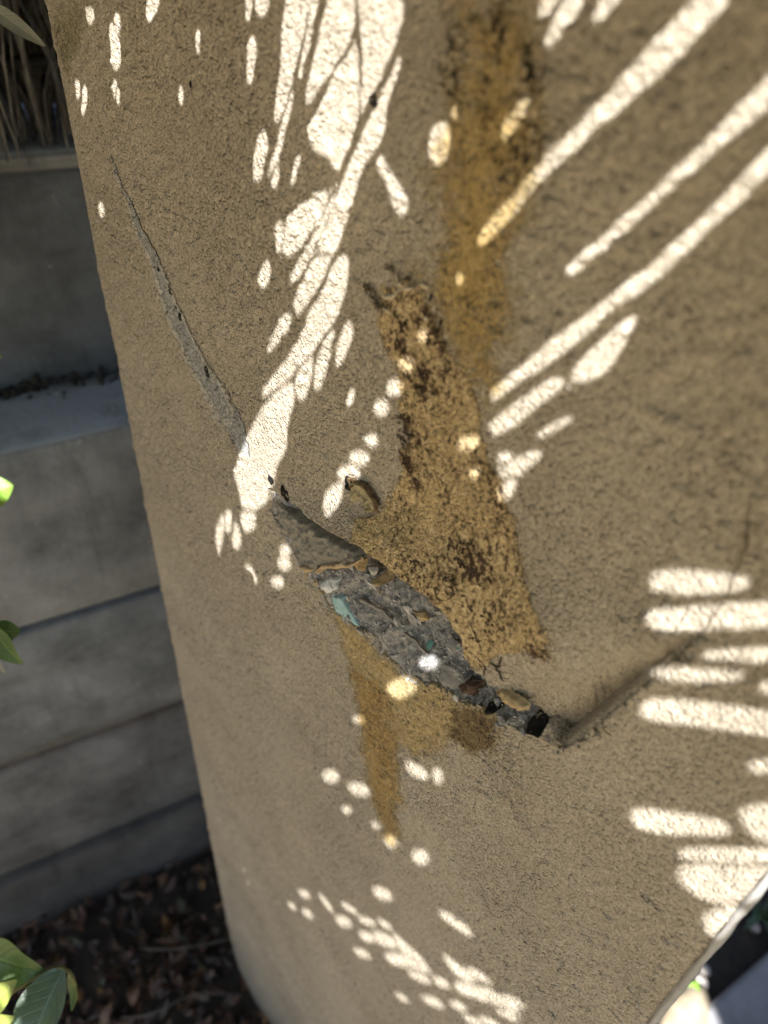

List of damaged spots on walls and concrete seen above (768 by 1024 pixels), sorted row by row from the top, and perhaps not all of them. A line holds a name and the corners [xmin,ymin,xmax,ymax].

crack [110,153,250,457]
rust [410,0,558,404]
crack [268,475,290,503]
rust [322,591,500,847]
flaking render [271,281,555,738]
crack [545,477,757,755]